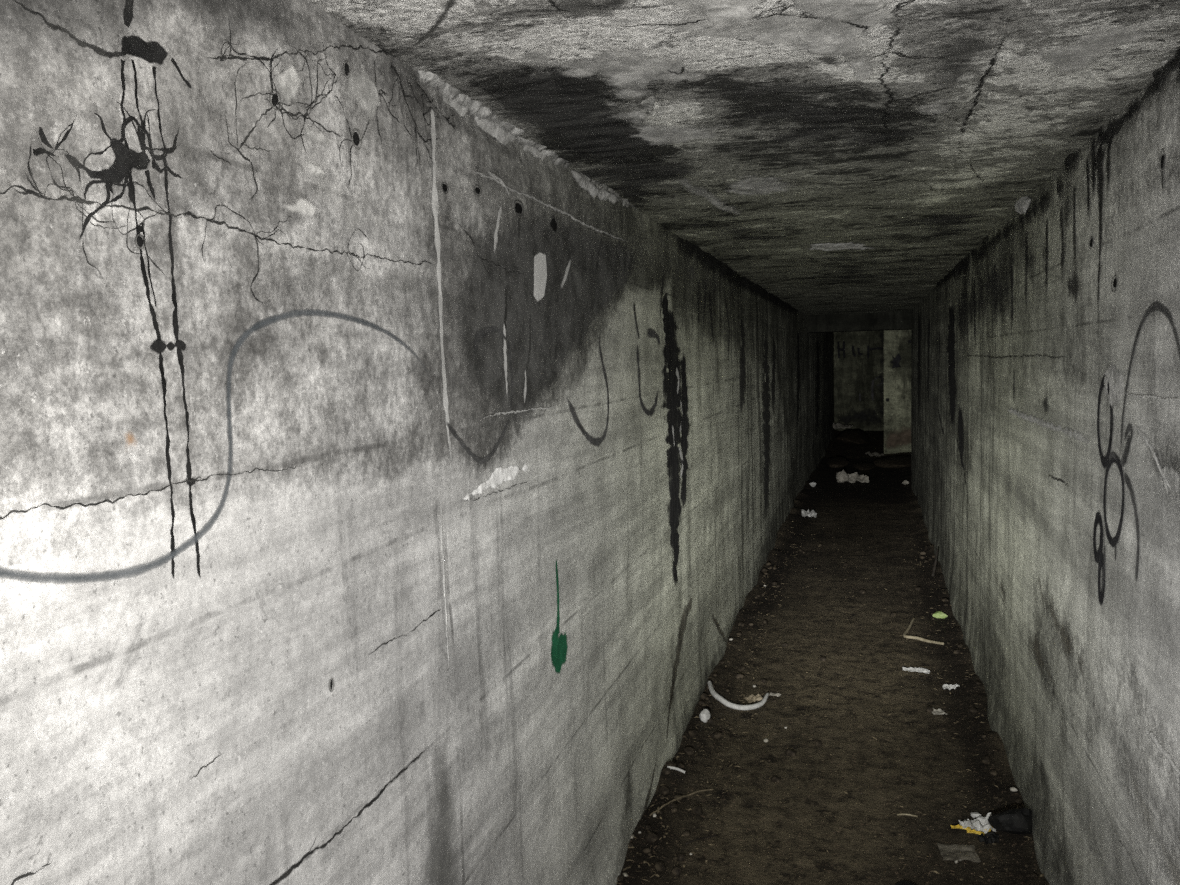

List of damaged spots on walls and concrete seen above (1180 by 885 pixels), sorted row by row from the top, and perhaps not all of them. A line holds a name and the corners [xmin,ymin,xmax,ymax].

crack [624,19,705,27]
crack [0,23,456,304]
leakage [491,69,694,204]
crack [747,0,1005,191]
leakage [903,127,1112,465]
crack [0,466,297,519]
crack [270,752,424,885]